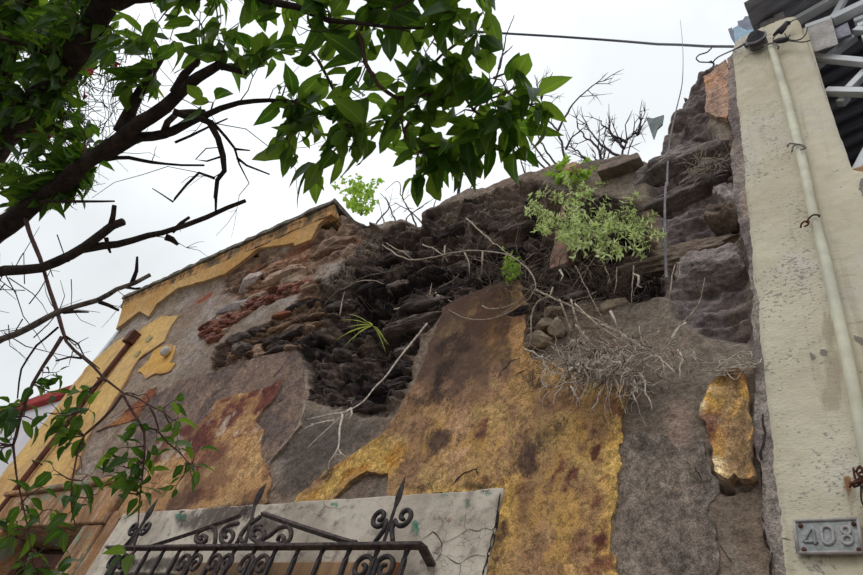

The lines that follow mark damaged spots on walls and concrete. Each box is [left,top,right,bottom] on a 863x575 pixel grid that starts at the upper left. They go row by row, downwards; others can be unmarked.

peeling [25,59,774,575]
peeling [0,337,125,504]
crack [423,467,501,575]